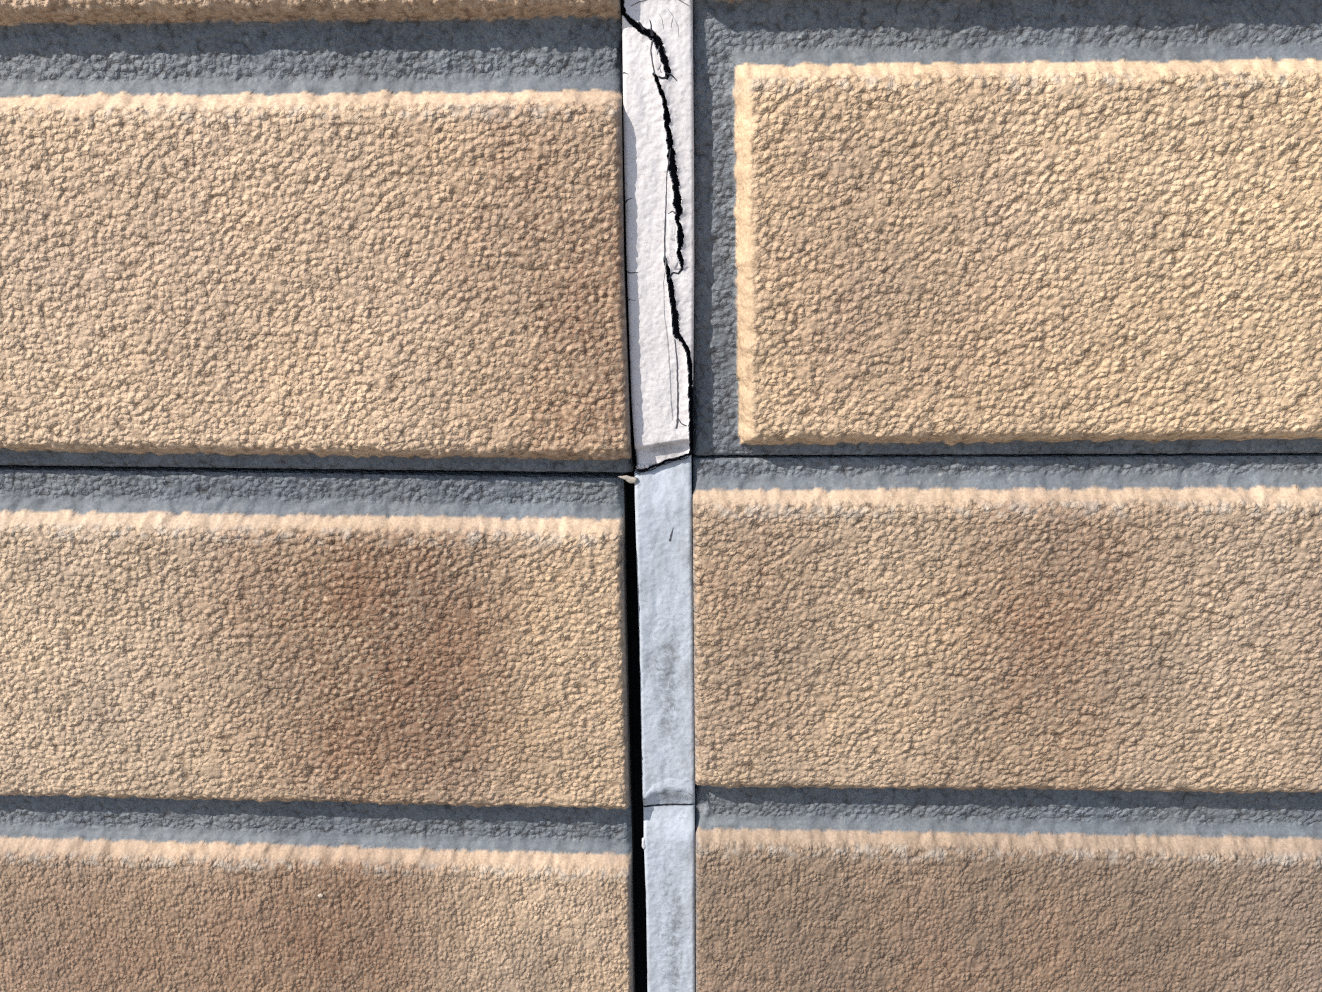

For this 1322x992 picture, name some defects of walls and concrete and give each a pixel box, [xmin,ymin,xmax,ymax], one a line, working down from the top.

crack [621,0,695,466]